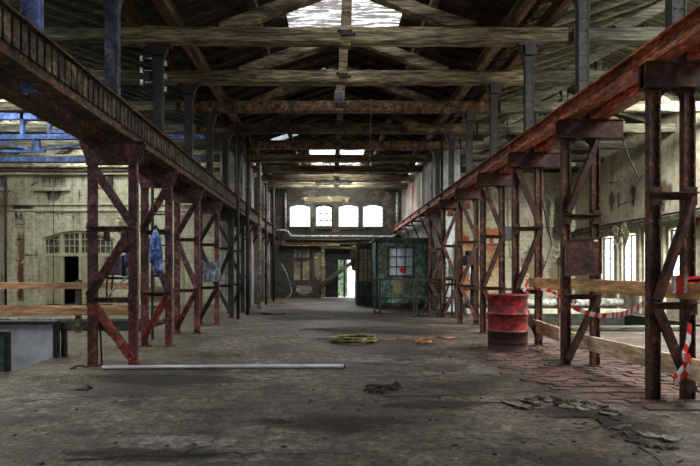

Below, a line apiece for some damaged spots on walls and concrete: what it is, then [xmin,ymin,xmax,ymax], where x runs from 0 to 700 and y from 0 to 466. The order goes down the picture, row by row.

spalling [462,395,683,464]